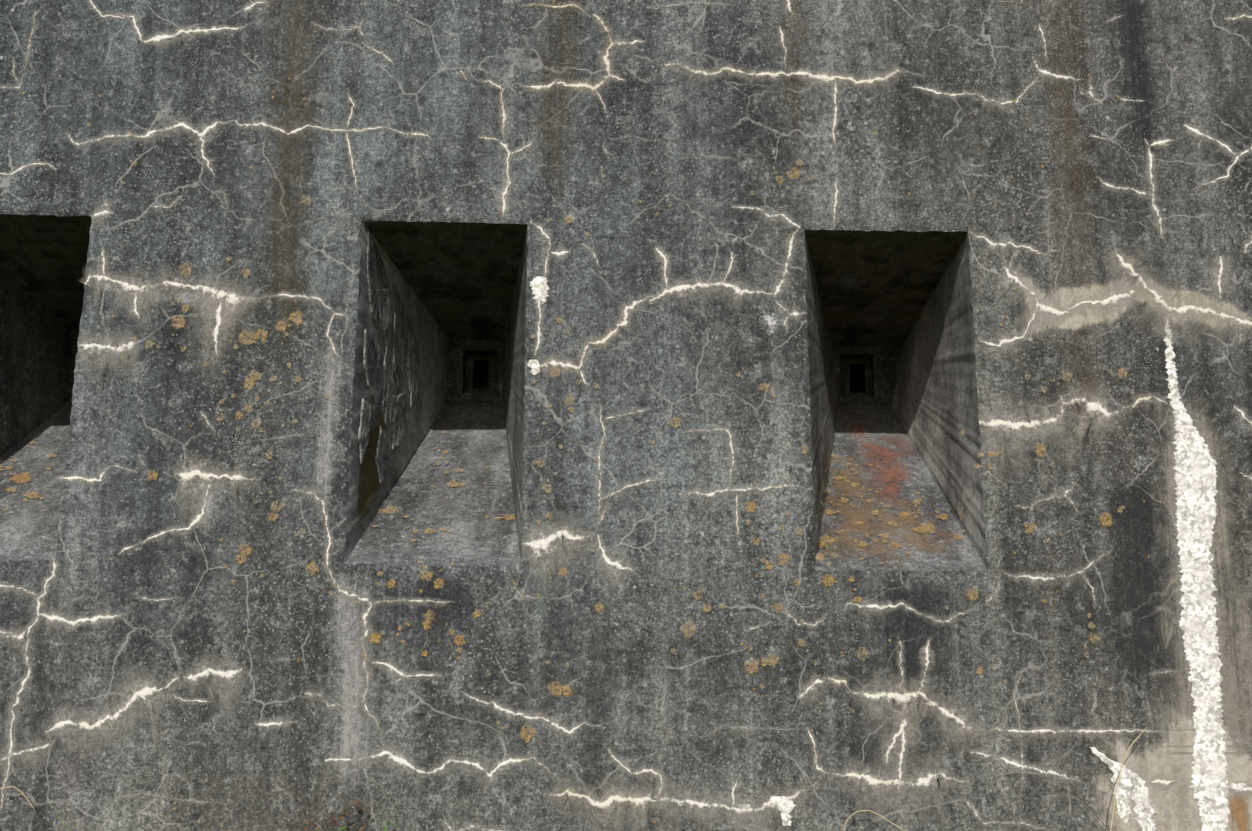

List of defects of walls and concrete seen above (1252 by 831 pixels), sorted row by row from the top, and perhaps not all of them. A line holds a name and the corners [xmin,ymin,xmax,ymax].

crack [90,0,268,45]
crack [67,94,431,205]
crack [1098,124,1252,235]
crack [77,199,348,371]
crack [460,0,1166,598]
crack [968,231,1252,351]
crack [60,465,136,484]
crack [119,464,261,554]
damp [1017,276,1252,831]
crack [0,558,243,809]
crack [254,489,1165,831]
damp [767,796,796,826]